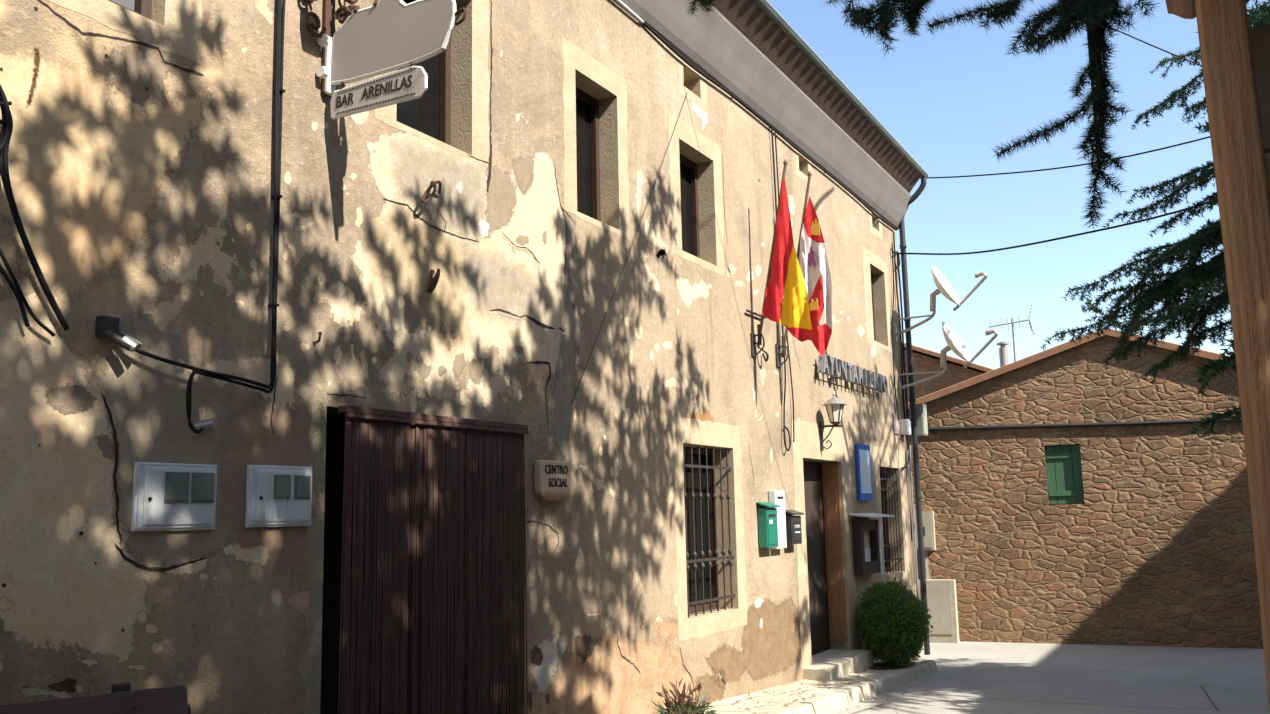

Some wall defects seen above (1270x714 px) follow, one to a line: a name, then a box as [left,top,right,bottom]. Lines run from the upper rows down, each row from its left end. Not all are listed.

crack [38,0,204,76]
peeling [351,111,369,126]
peeling [311,131,585,407]
crack [384,165,579,425]
peeling [0,47,223,671]
peeling [176,342,310,412]
peeling [655,485,673,512]
peeling [220,543,271,566]
peeling [590,520,601,581]
peeling [20,678,84,699]
crack [617,639,641,674]
spalling [527,593,802,714]